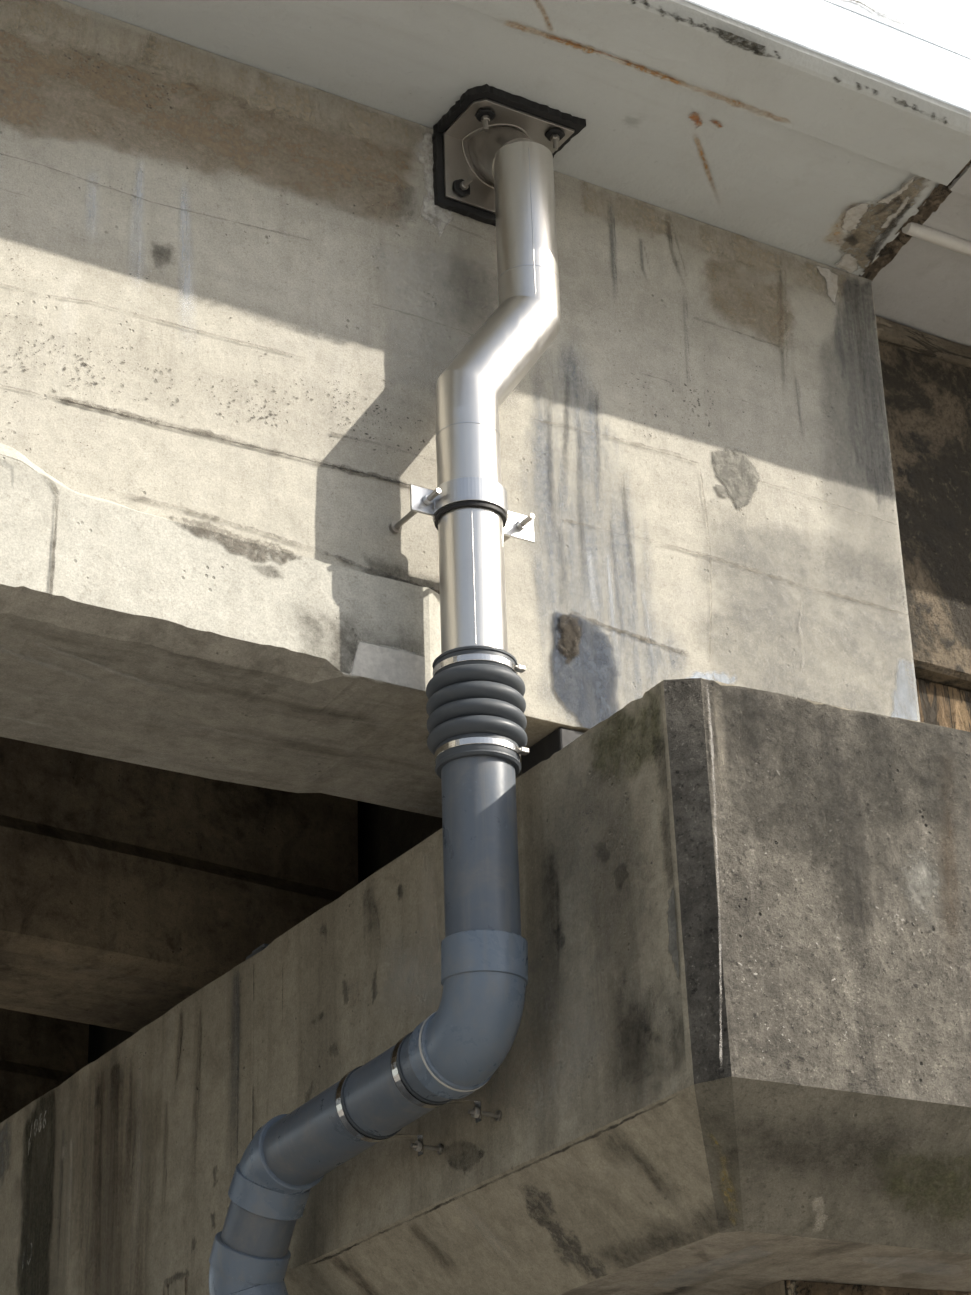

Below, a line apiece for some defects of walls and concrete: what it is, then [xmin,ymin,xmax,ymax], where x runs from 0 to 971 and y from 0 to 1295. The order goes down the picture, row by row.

corrosion [536,0,682,84]
damp [0,0,451,233]
corrosion [689,112,722,127]
peeling [816,177,925,303]
damp [536,414,672,729]